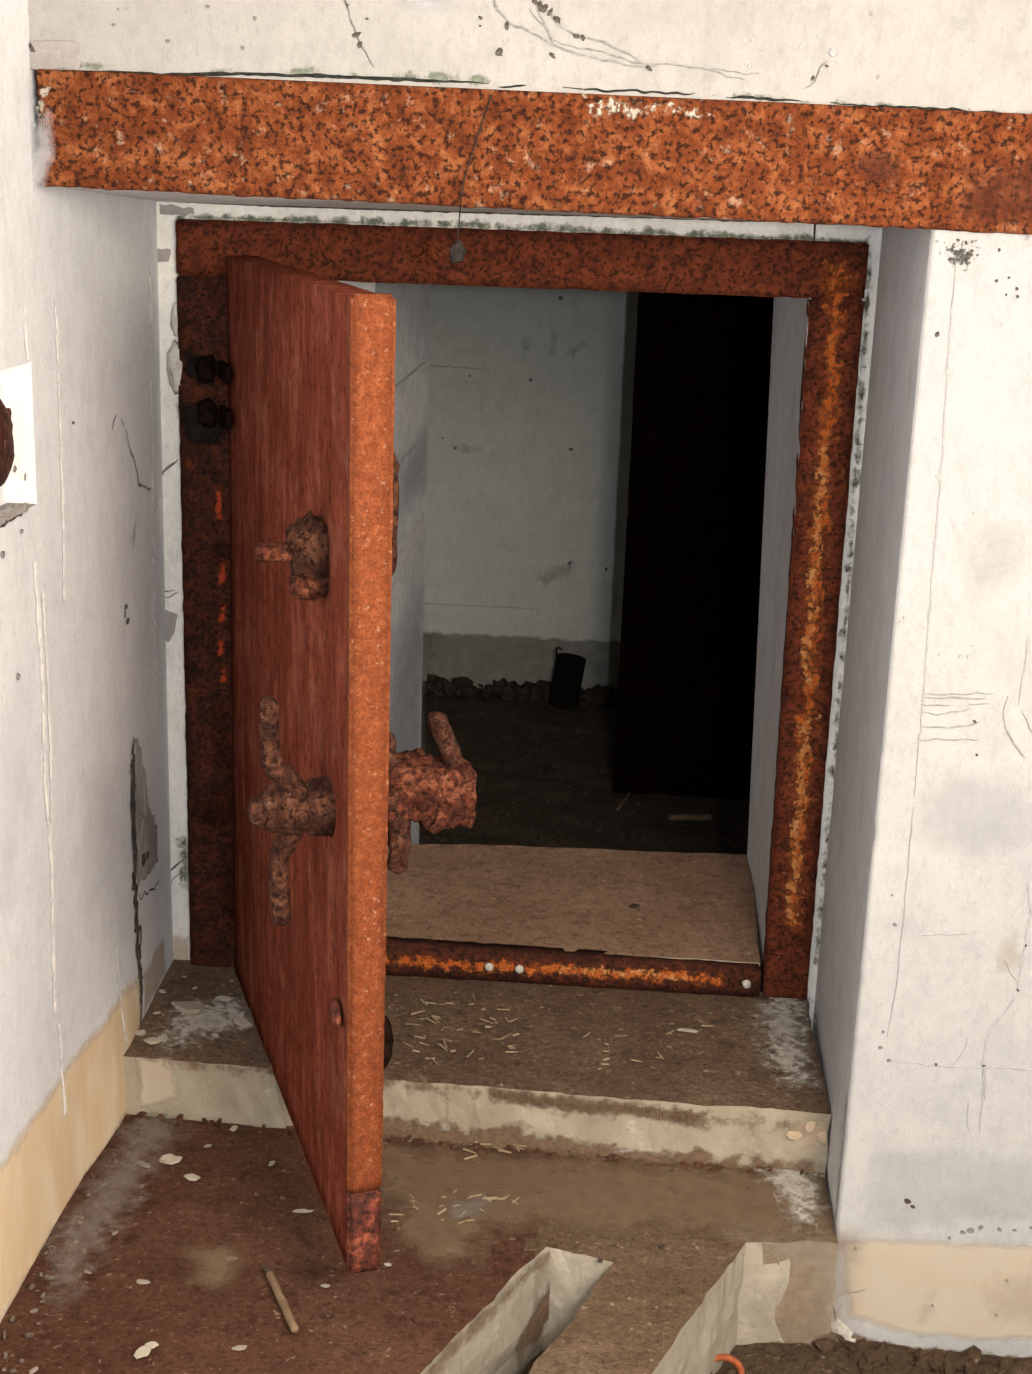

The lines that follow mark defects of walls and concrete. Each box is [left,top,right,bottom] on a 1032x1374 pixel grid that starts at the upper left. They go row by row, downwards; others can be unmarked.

crack [344,0,374,67]
crack [478,0,759,80]
corrosion [215,489,223,520]
corrosion [218,562,227,586]
corrosion [779,260,860,931]
corrosion [217,640,228,683]
spalling [129,735,158,886]
crack [132,852,188,1026]
corrosion [173,938,187,960]
corrosion [385,953,724,987]